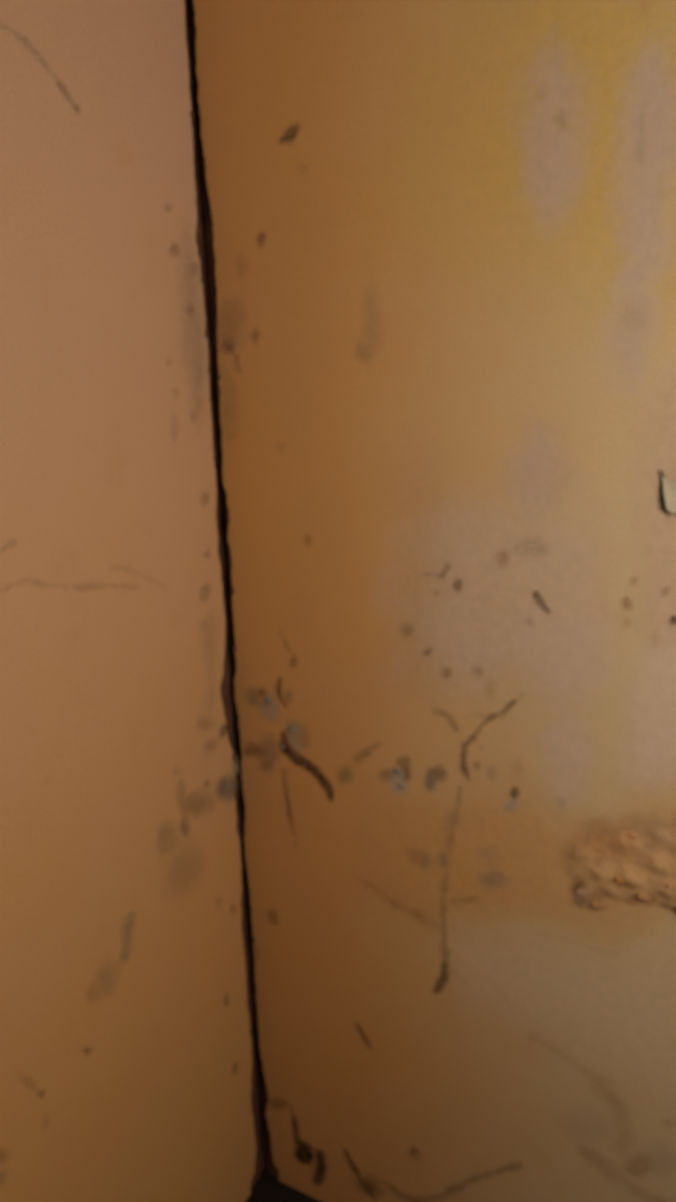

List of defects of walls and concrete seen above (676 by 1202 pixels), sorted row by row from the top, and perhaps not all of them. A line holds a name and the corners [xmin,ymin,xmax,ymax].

crack [184,0,279,1190]
peeling [653,468,676,518]
crack [274,677,336,848]
crack [430,695,522,997]